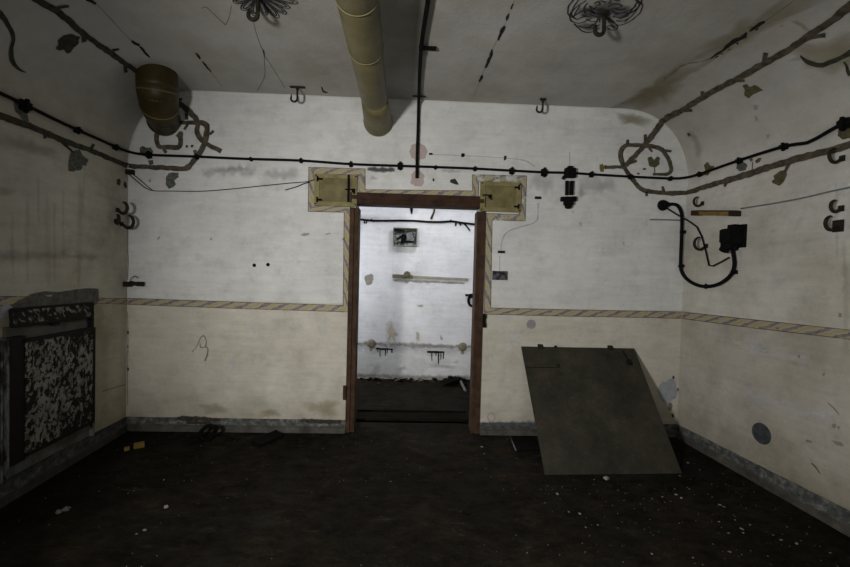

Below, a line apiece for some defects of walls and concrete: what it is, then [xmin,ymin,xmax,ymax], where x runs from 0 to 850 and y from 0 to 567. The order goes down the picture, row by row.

crack [479,4,513,82]